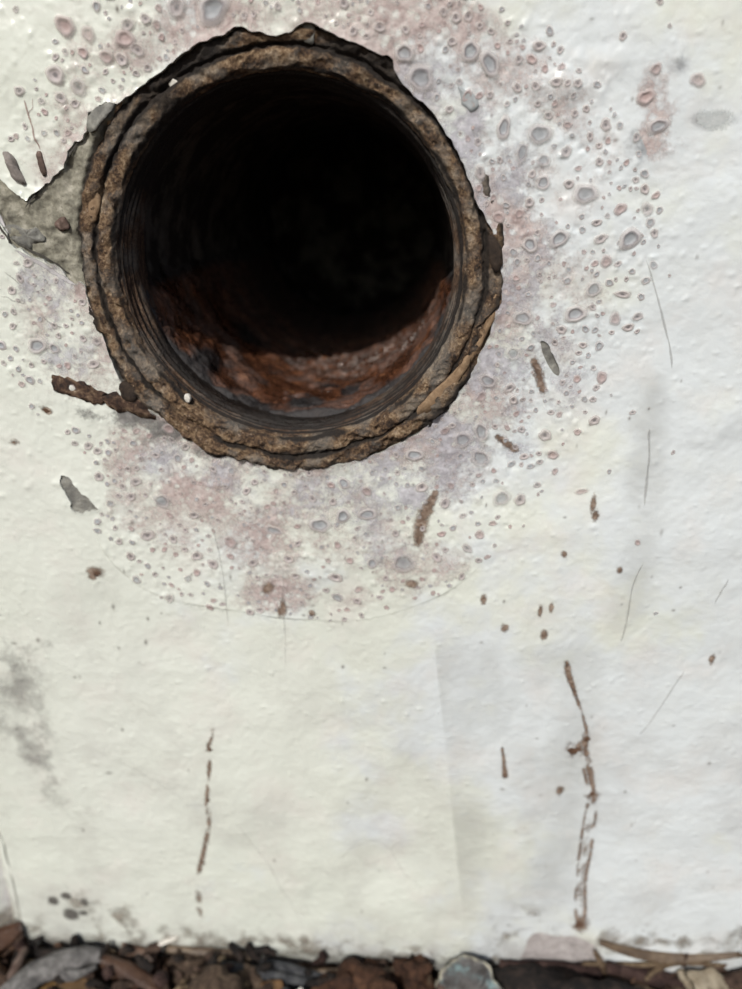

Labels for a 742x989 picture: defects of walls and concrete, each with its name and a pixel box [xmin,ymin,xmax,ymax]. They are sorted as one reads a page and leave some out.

rust [302,23,315,45]
peeling [0,97,129,285]
rust [88,193,102,223]
rust [487,235,503,273]
rust [146,240,454,417]
rust [417,293,502,415]
rust [495,434,518,452]
peeling [60,476,98,513]
rust [413,490,438,546]
rust [197,737,212,874]
rust [564,661,598,931]